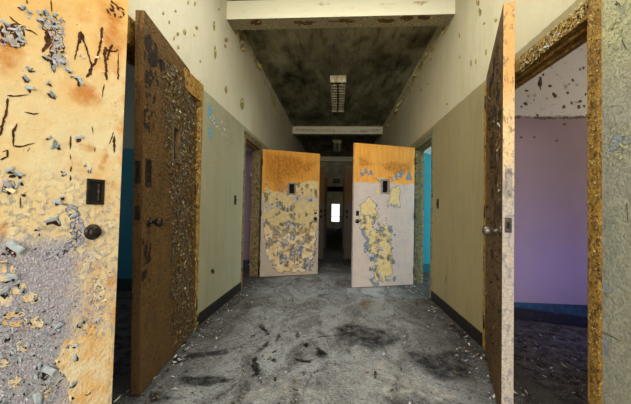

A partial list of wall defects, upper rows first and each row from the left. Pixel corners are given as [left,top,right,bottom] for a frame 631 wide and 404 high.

peeling [0,19,27,48]
peeling [22,65,36,93]
peeling [18,4,85,87]
peeling [224,15,450,127]
peeling [1,166,26,197]
peeling [142,34,201,346]
peeling [249,180,319,273]
peeling [359,168,396,286]
peeling [387,168,418,230]
peeling [0,196,118,404]